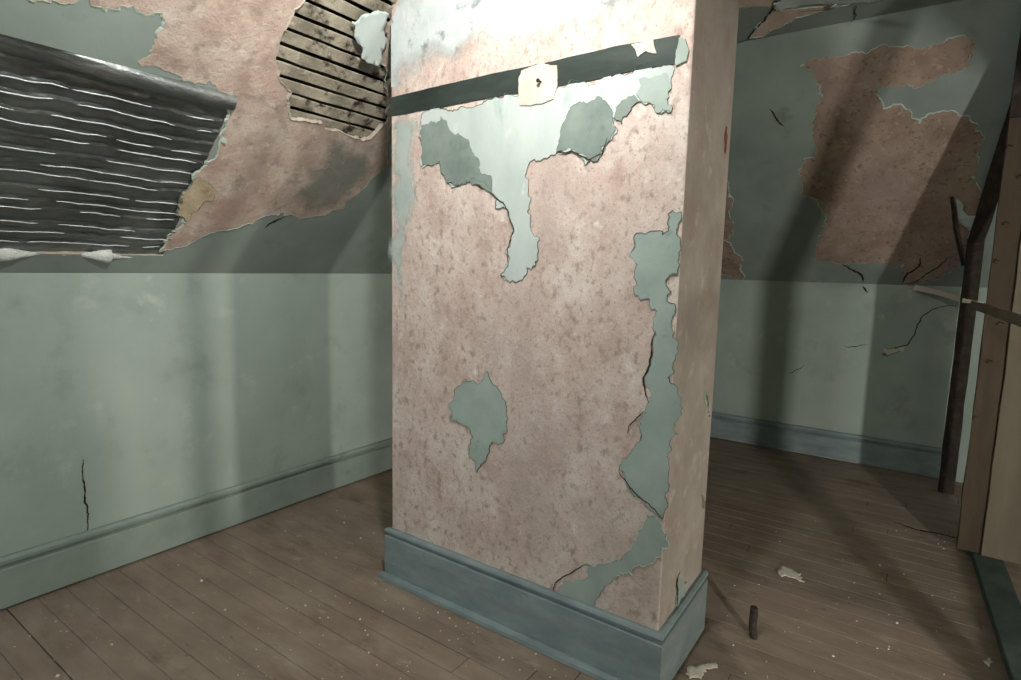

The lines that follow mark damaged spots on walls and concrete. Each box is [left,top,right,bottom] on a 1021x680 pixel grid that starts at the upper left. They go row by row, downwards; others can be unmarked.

peeling [739,0,887,38]
peeling [28,0,675,283]
peeling [798,34,986,286]
peeling [721,181,746,280]
crack [895,305,951,348]
crack [627,333,655,433]
crack [81,459,89,530]
crack [618,471,662,519]